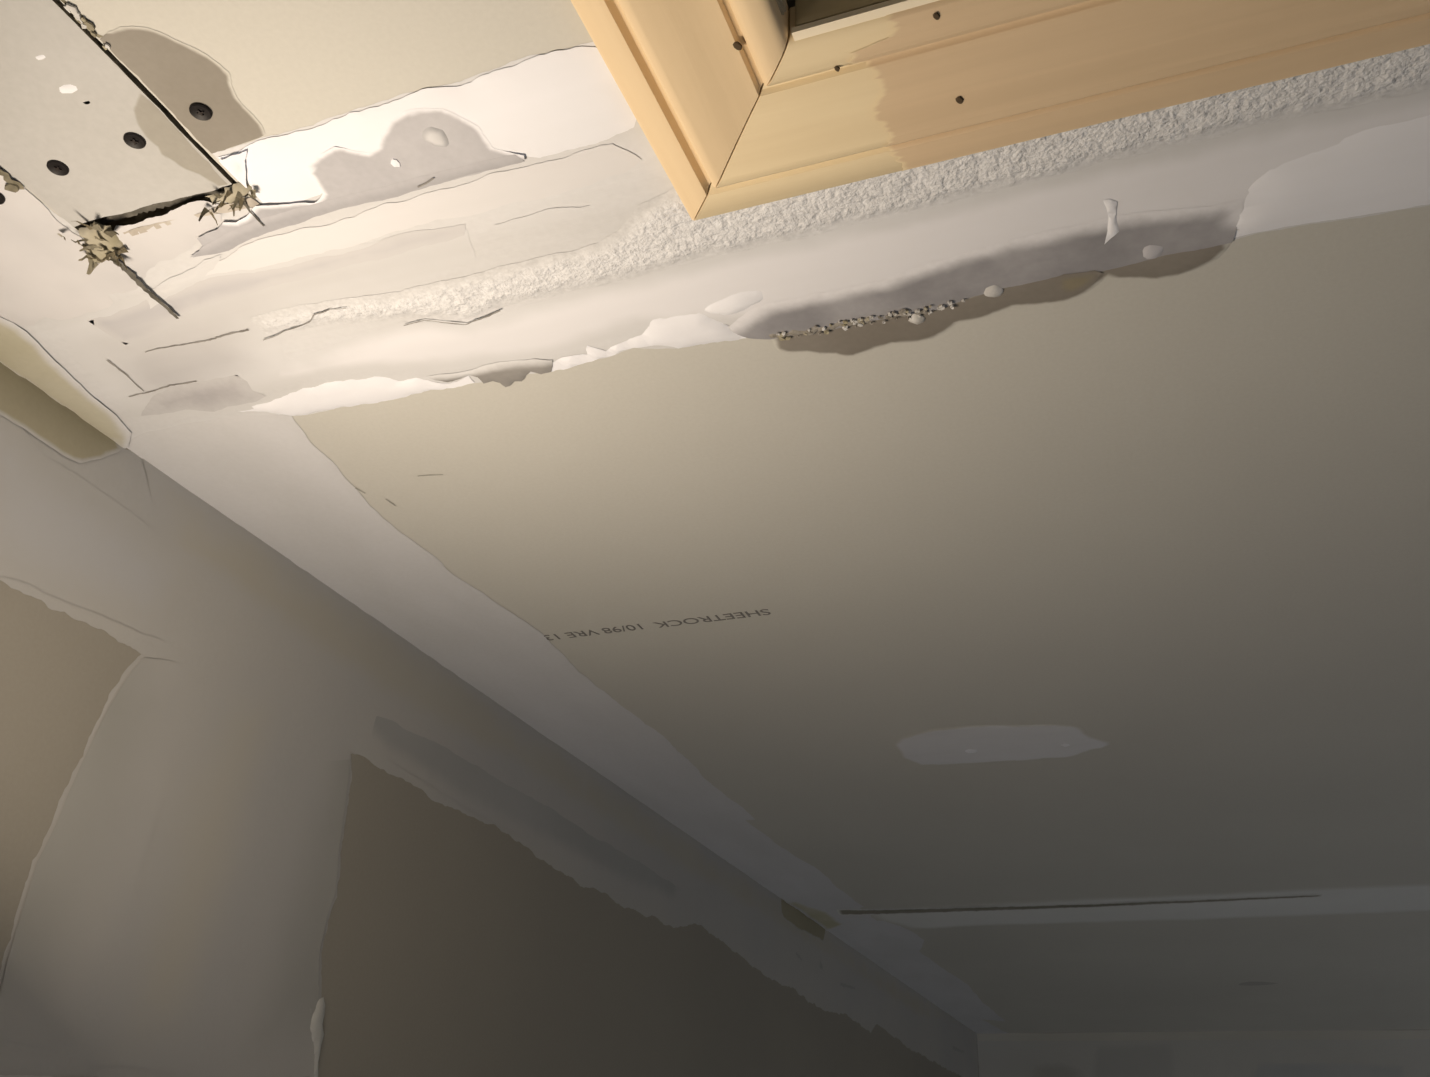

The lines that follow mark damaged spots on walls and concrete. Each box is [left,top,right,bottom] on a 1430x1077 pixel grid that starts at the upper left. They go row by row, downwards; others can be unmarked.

spalling [61,0,111,50]
water stain [100,26,265,186]
spalling [0,169,24,193]
crack [85,179,264,226]
water stain [191,108,525,257]
spalling [124,220,172,236]
water stain [728,199,1243,357]
crack [107,261,346,397]
crack [404,310,500,326]